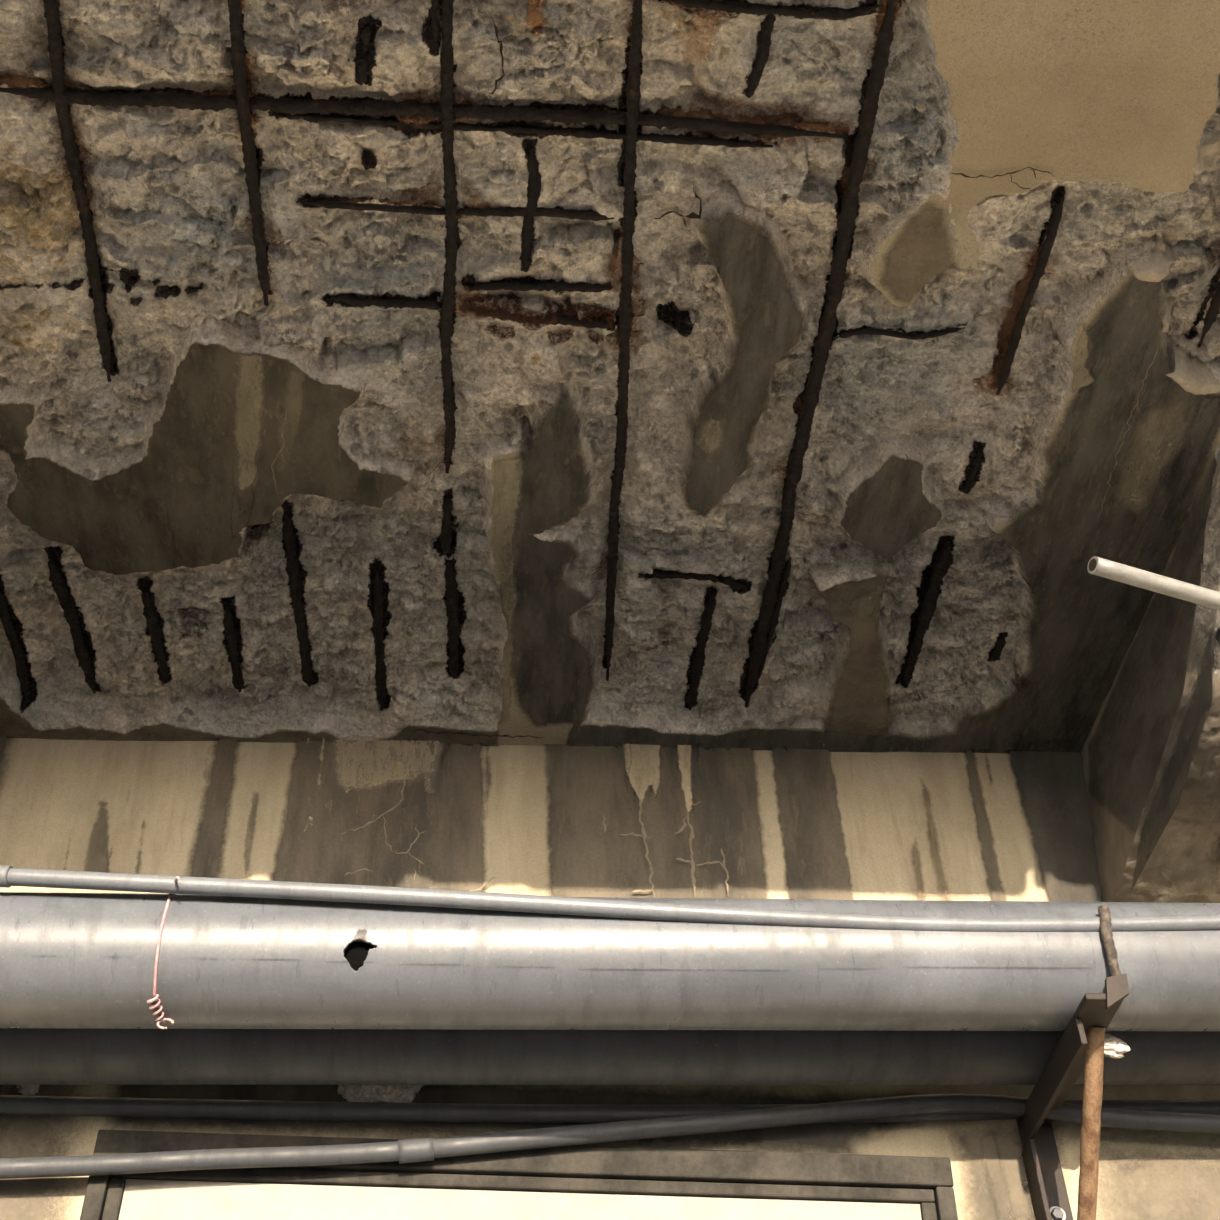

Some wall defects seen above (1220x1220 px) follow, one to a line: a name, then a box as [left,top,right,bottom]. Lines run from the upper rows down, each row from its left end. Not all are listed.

rust [0,0,968,529]
spalling [0,0,1220,741]
water stain [684,213,804,516]
crack [952,167,1055,190]
rust [976,186,1066,396]
rust [0,574,38,713]
rust [44,545,102,692]
rust [367,558,392,659]
rust [433,488,467,679]
water stain [0,275,1220,902]
rust [684,553,789,709]
crack [603,799,729,898]